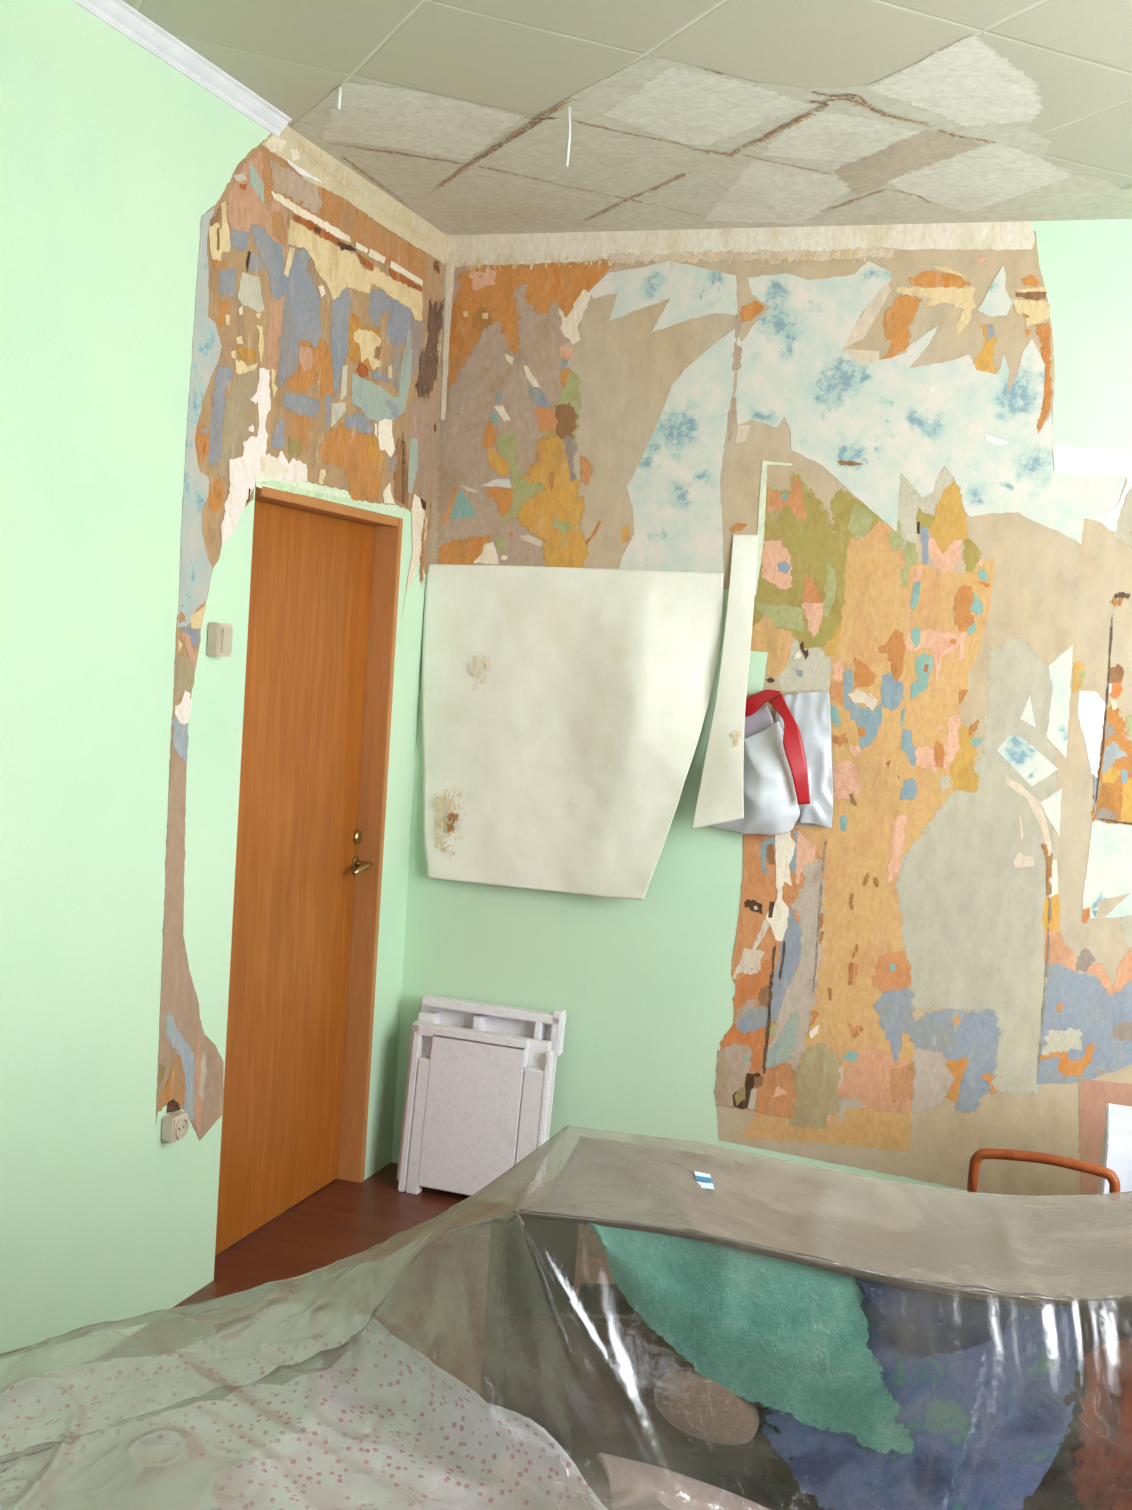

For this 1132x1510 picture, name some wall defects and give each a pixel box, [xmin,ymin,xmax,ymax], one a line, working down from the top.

water stain [578,90,997,174]
spalling [209,201,231,261]
water stain [459,247,886,274]
water stain [825,189,929,212]
flaking render [262,35,1132,616]
spalling [221,306,326,546]
peeling [178,605,206,650]
peeling [1072,661,1087,696]
peeling [1091,663,1132,824]
peeling [713,467,1001,1152]
peeling [1037,894,1132,1195]
spalling [167,1099,180,1113]